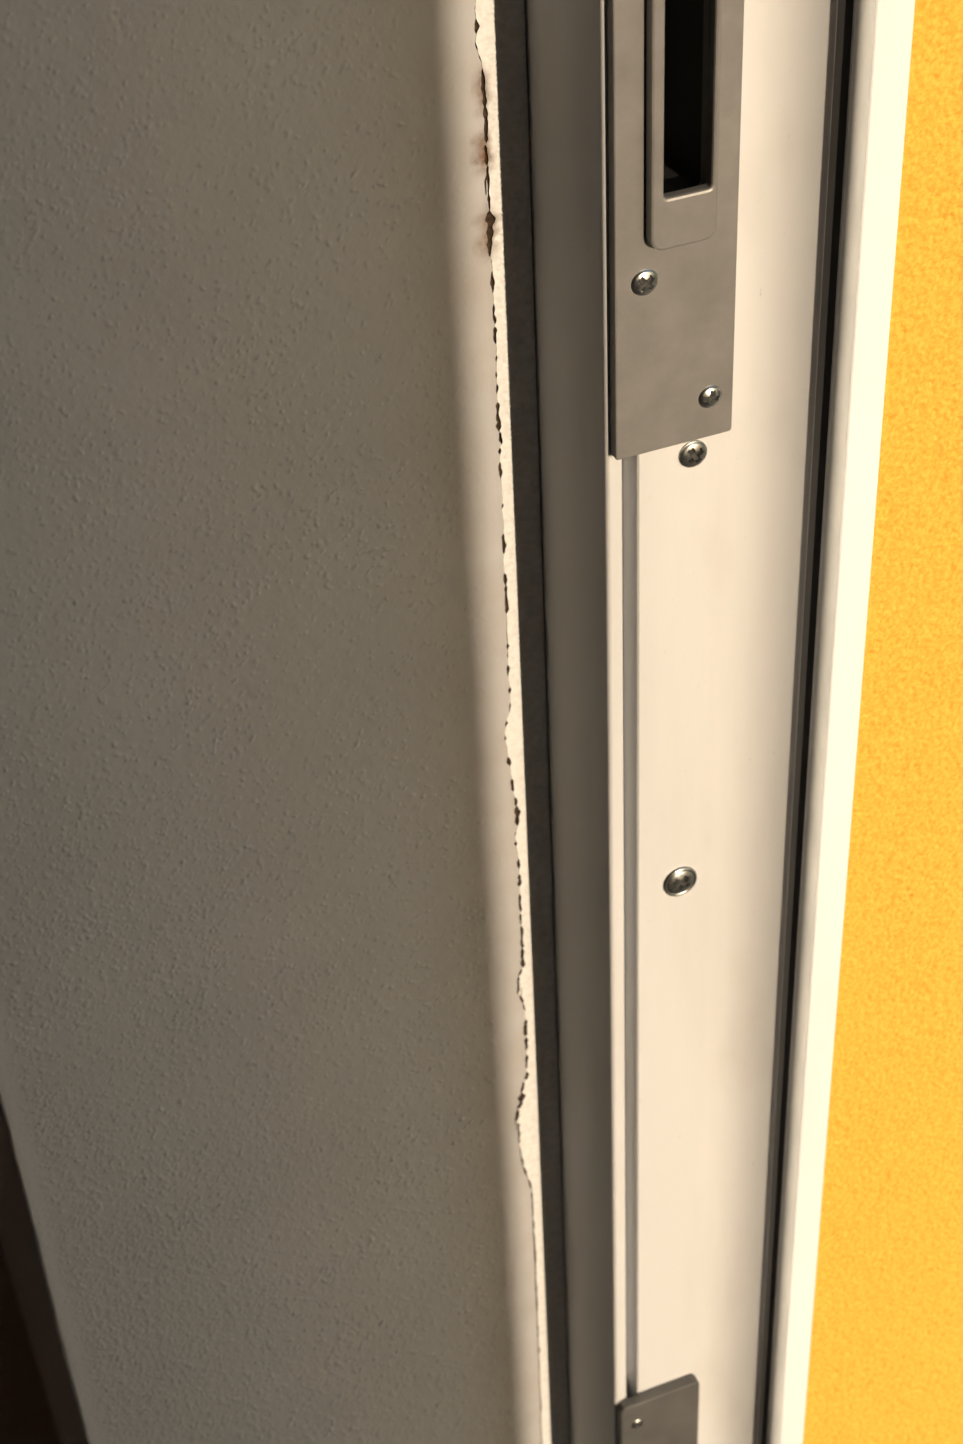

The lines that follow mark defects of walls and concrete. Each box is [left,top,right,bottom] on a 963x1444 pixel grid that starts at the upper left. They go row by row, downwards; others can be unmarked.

crack [474,3,542,1444]